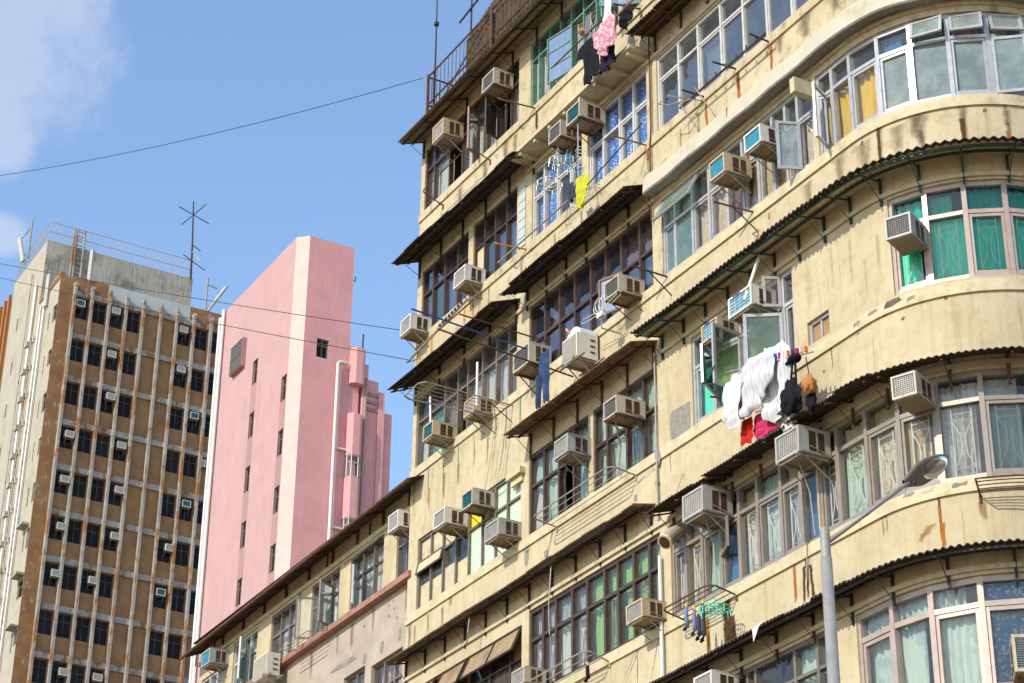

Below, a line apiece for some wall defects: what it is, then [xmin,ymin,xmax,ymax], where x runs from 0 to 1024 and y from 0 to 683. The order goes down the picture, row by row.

corrosion [937,506,946,547]